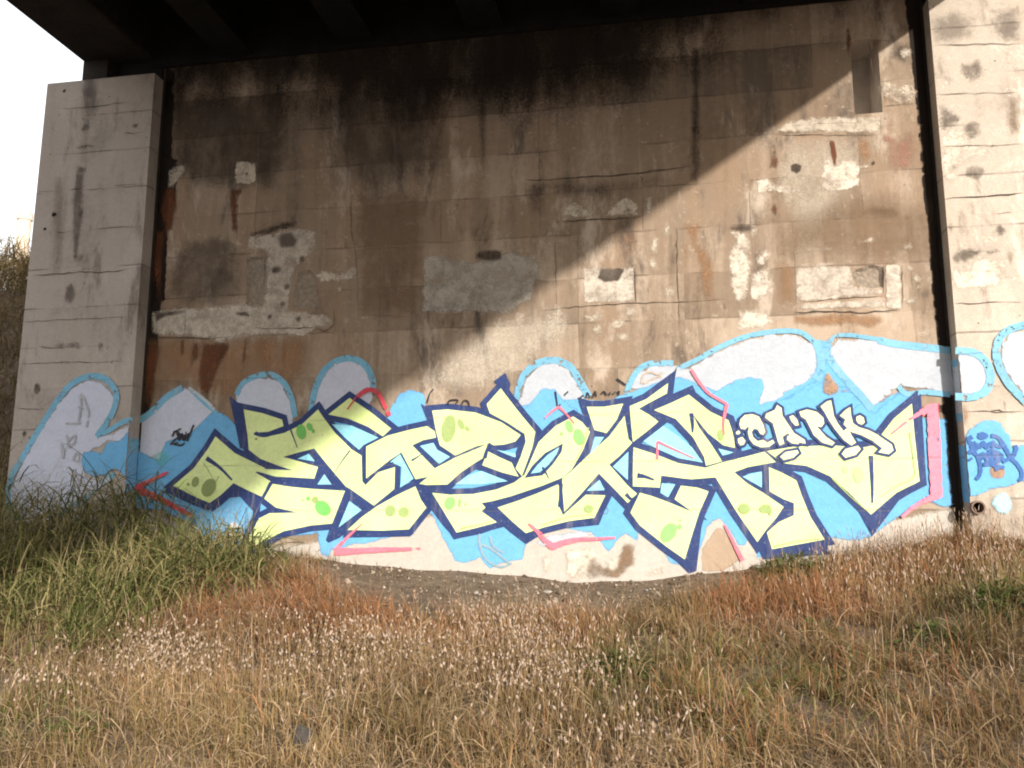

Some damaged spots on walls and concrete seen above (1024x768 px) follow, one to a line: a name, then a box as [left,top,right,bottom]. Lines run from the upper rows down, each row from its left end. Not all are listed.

leakage [147,12,733,349]
rust [231,190,241,230]
peeling [564,204,591,217]
peeling [608,198,651,215]
rust [153,189,176,290]
spalling [246,256,265,308]
spalling [801,265,884,309]
rust [181,341,228,393]
leakage [143,370,156,414]